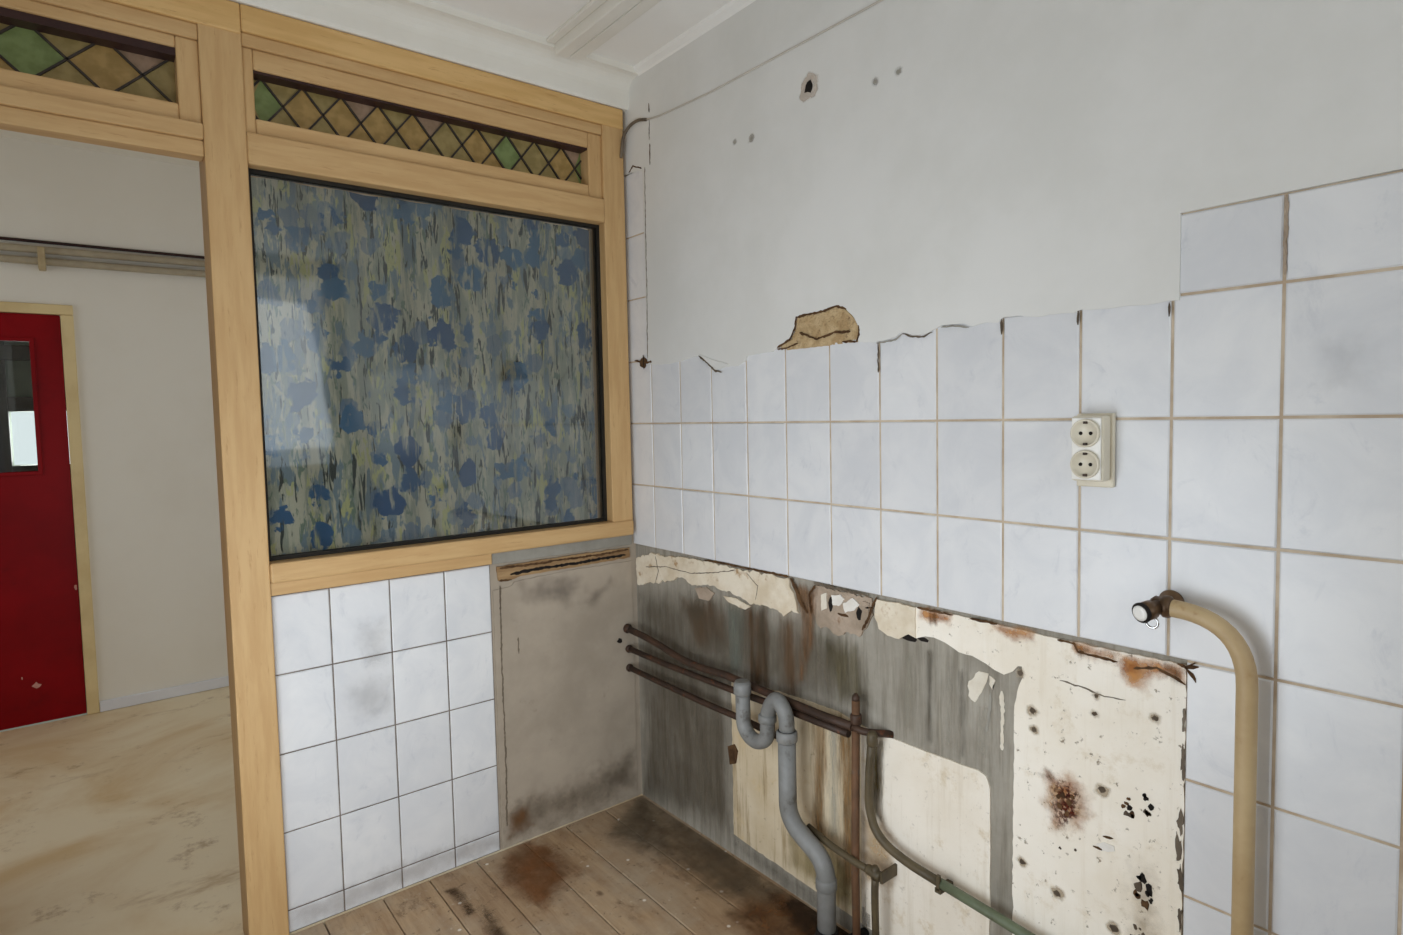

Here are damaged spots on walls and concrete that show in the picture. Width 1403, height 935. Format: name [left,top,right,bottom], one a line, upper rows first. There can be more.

spalling [777,305,860,350]
peeling [496,547,929,642]
rust [1057,639,1186,685]
spalling [728,744,738,765]
leakage [616,604,862,935]
rust [1048,774,1080,824]
leakage [1121,793,1154,819]
peeling [1093,836,1115,852]
leakage [504,844,565,902]
peeling [1133,873,1153,911]
spalling [1175,809,1184,931]
spalling [1107,922,1145,935]